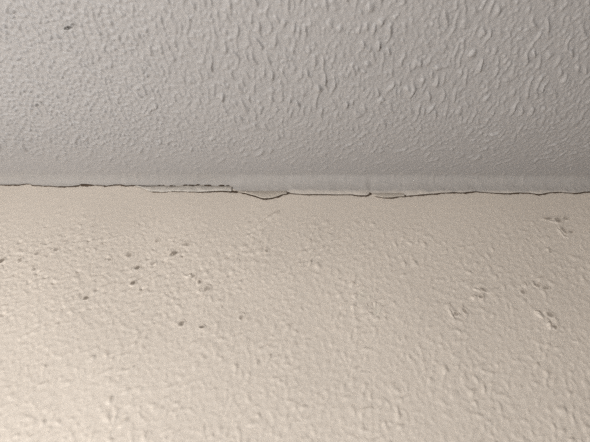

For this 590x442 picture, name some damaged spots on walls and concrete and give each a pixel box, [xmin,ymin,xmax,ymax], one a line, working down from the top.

crack [2,184,590,200]